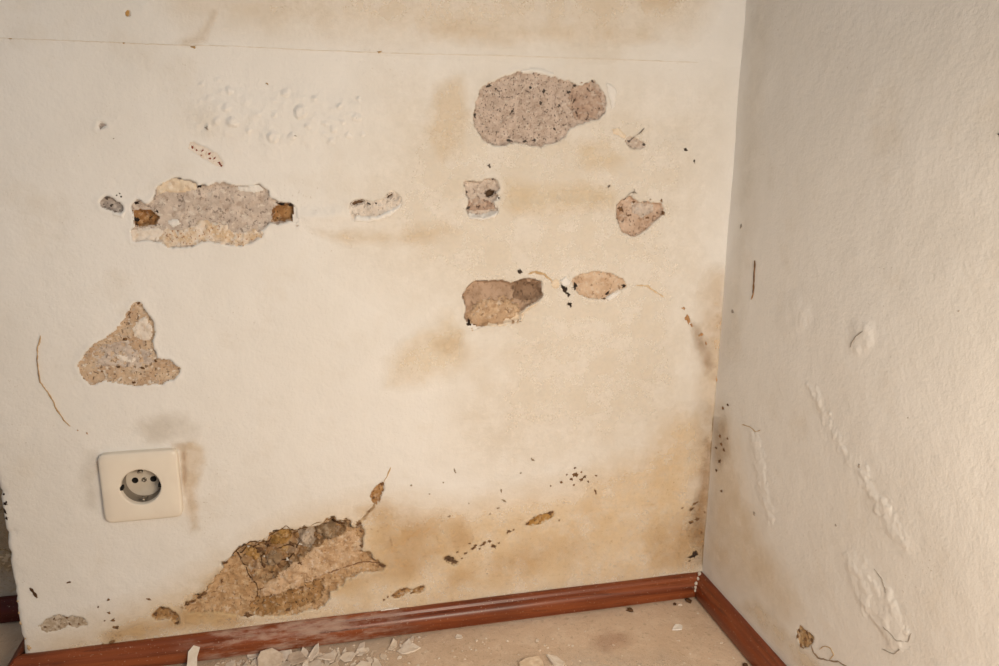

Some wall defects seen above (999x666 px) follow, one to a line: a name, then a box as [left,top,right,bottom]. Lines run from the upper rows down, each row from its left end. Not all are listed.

spalling [473,68,617,147]
spalling [100,178,298,248]
spalling [349,191,402,223]
spalling [464,164,500,221]
spalling [616,189,665,237]
spalling [462,269,664,331]
spalling [77,302,181,386]
spalling [146,467,391,625]
leakage [330,451,706,607]
spalling [38,614,88,633]